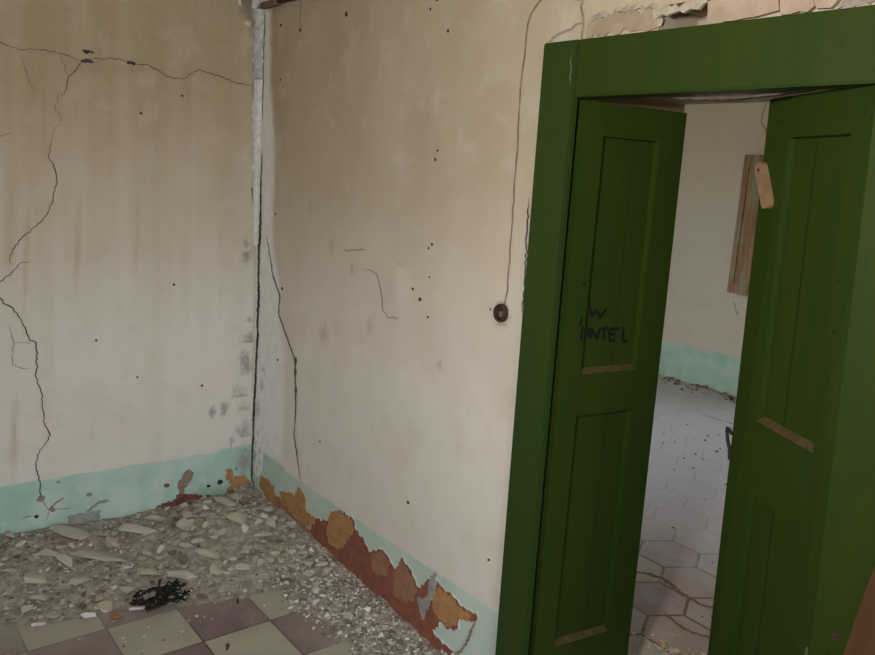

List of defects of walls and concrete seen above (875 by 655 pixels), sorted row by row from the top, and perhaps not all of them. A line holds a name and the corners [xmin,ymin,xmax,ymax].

spalling [586,0,875,39]
crack [0,15,265,519]
crack [251,155,300,487]
peeling [155,467,479,655]